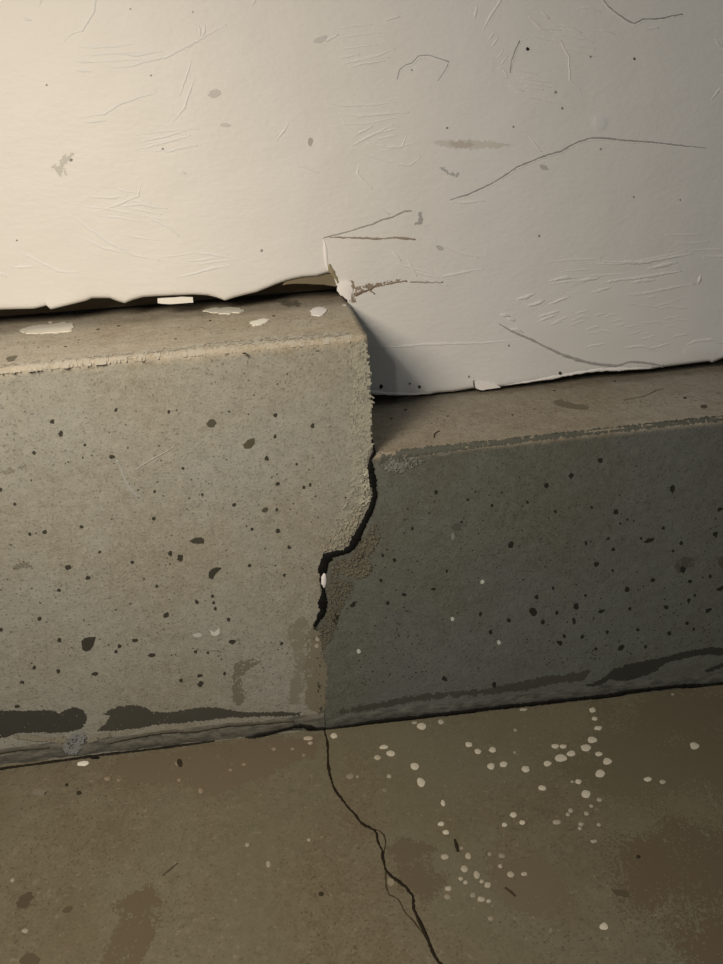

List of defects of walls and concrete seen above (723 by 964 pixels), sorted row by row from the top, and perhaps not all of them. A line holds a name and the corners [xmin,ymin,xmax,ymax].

crack [603,0,683,24]
crack [450,137,704,200]
peeling [283,237,353,302]
crack [313,439,378,630]
damp [97,616,309,744]
damp [336,647,723,715]
damp [0,707,87,738]
crack [0,740,215,770]
damp [548,687,723,816]
crack [242,658,723,964]
damp [385,836,451,912]